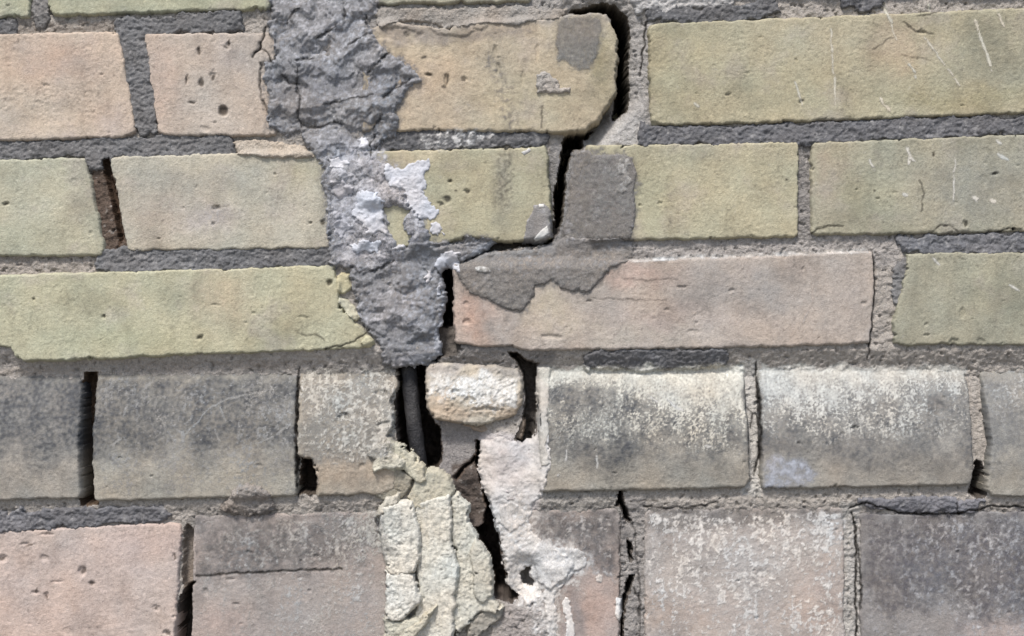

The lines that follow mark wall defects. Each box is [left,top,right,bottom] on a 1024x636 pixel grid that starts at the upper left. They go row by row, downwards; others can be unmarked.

peeling [311,157,406,254]
peeling [357,136,371,151]
peeling [384,130,494,235]
crack [437,2,647,360]
spalling [328,272,360,321]
peeling [424,251,461,295]
crack [293,367,301,497]
spalling [394,368,410,452]
spalling [417,358,443,467]
crack [507,351,540,442]
crack [452,439,519,604]
peeling [477,366,603,636]